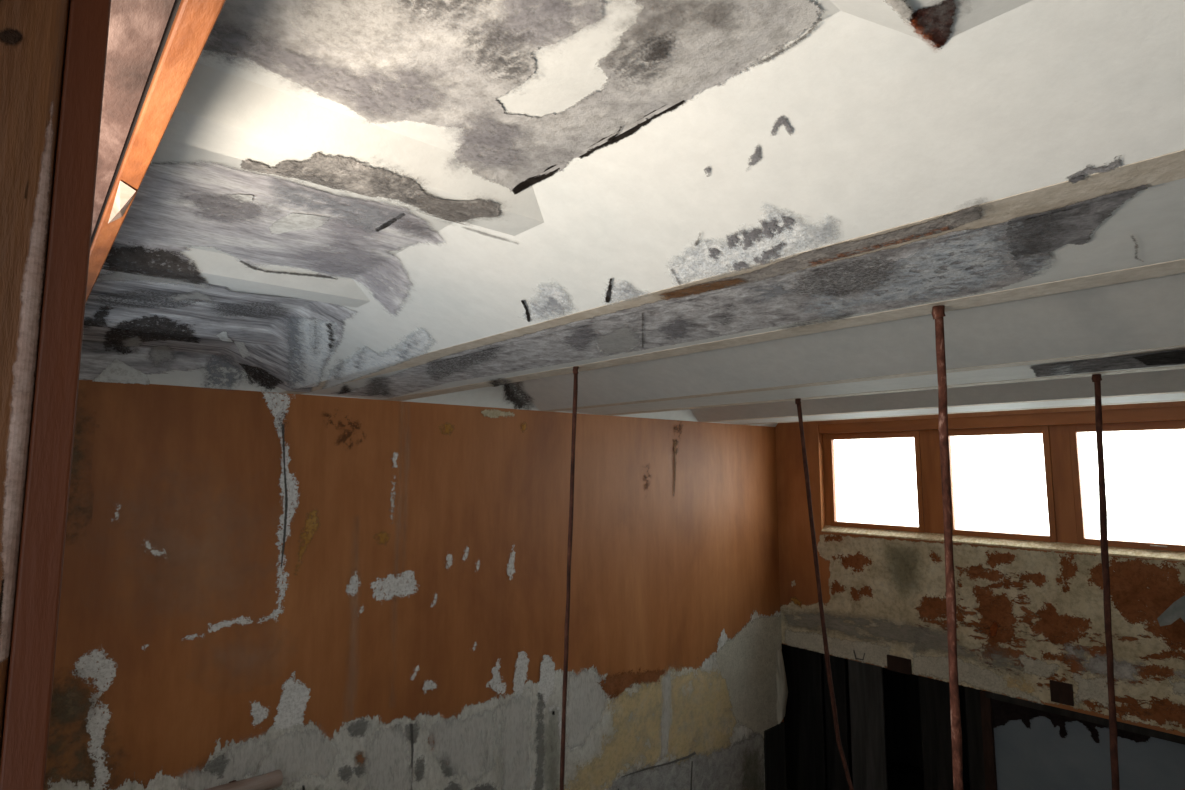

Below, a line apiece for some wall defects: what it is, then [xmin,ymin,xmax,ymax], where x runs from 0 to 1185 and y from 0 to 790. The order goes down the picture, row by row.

spalling [885,0,913,23]
corrosion [906,0,956,49]
peeling [204,0,823,192]
crack [512,100,685,194]
water stain [288,317,338,388]
peeling [79,152,1147,640]
peeling [47,534,1185,790]